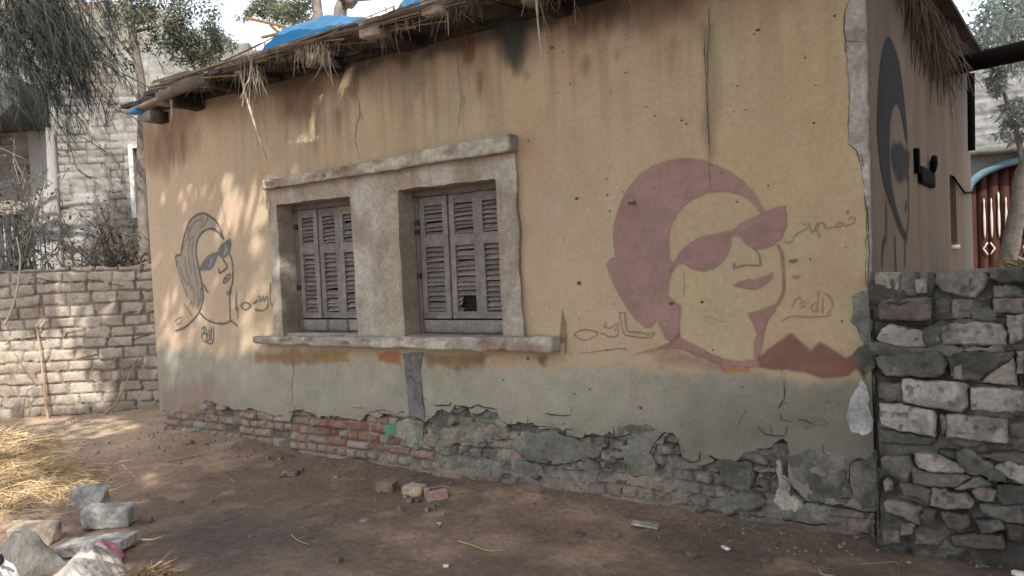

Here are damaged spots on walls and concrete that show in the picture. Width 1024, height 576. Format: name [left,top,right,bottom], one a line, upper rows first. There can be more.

water stain [498,19,524,68]
spalling [163,396,875,537]
crack [737,367,1014,526]